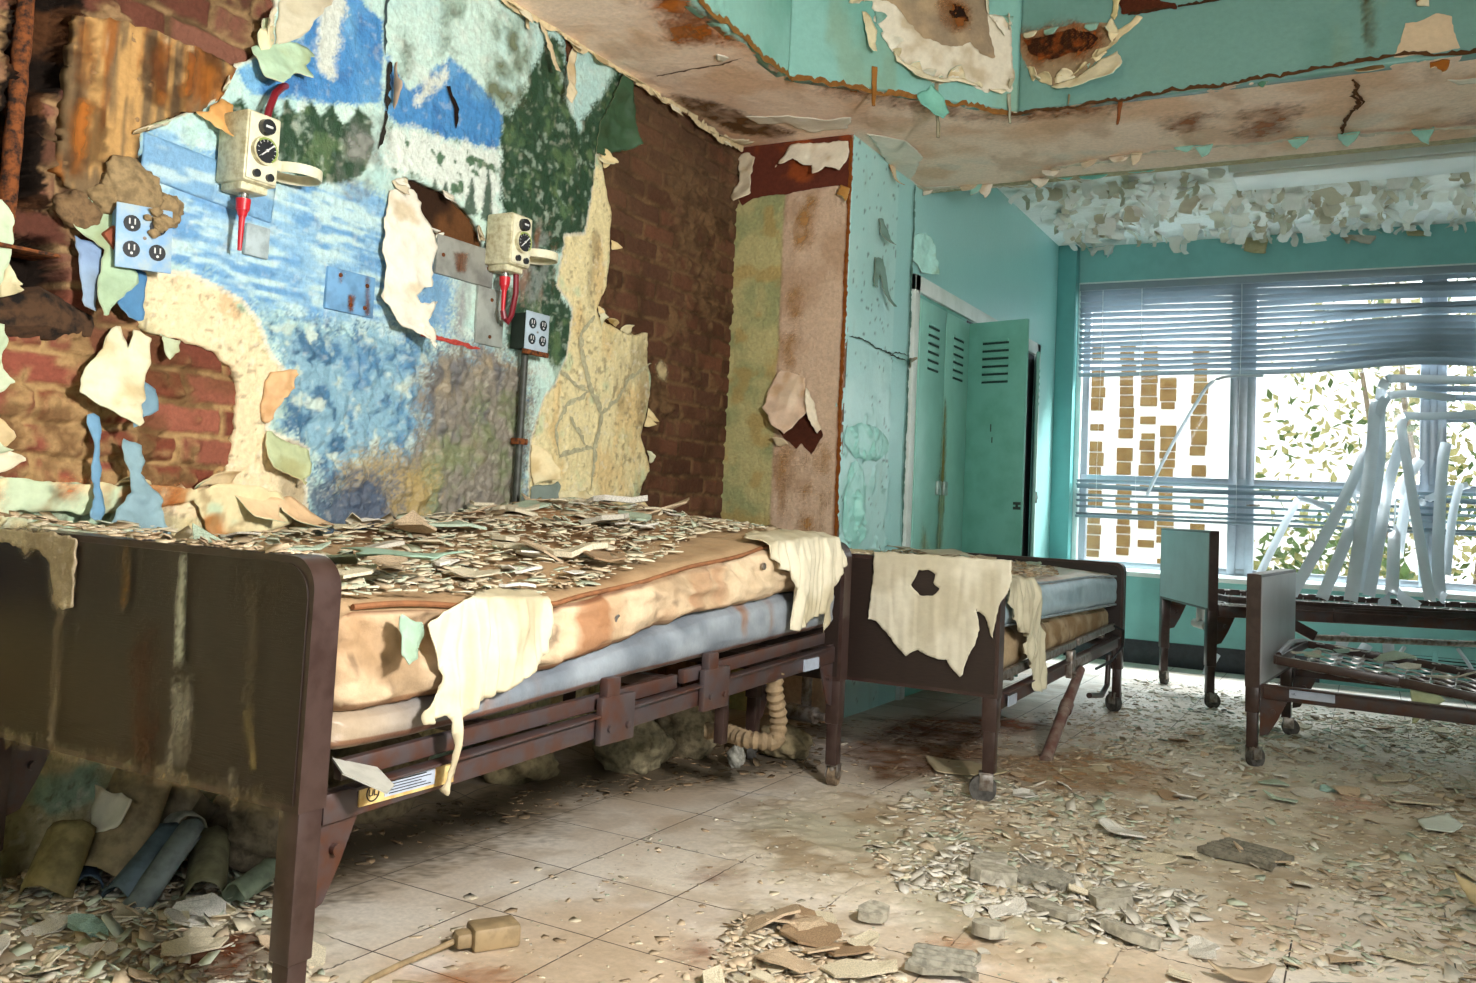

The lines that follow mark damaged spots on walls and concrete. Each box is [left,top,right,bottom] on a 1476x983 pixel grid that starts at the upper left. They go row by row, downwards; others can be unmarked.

crack [378,0,393,149]
peeling [849,0,1177,118]
rust [655,0,1476,138]
crack [1128,0,1219,15]
peeling [1338,131,1360,147]
crack [1340,79,1365,134]
peeling [1411,127,1434,145]
peeling [959,144,1476,258]
flaking render [0,0,852,796]